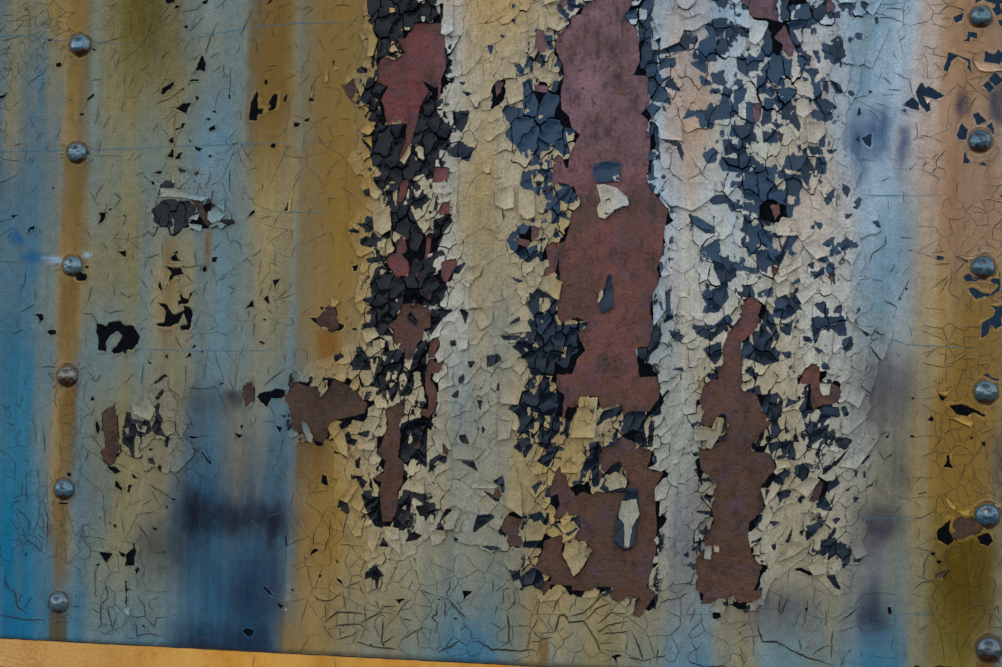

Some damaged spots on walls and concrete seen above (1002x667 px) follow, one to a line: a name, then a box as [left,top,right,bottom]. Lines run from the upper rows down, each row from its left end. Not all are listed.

peeling [943,0,1002,95]
peeling [146,55,256,237]
peeling [898,81,947,116]
peeling [955,110,997,166]
peeling [94,316,143,359]
peeling [153,251,199,333]
peeling [238,0,893,621]
crack [854,0,1002,667]
peeling [957,254,1002,342]
peeling [94,374,211,495]
crack [235,437,907,667]
peeling [931,498,996,583]